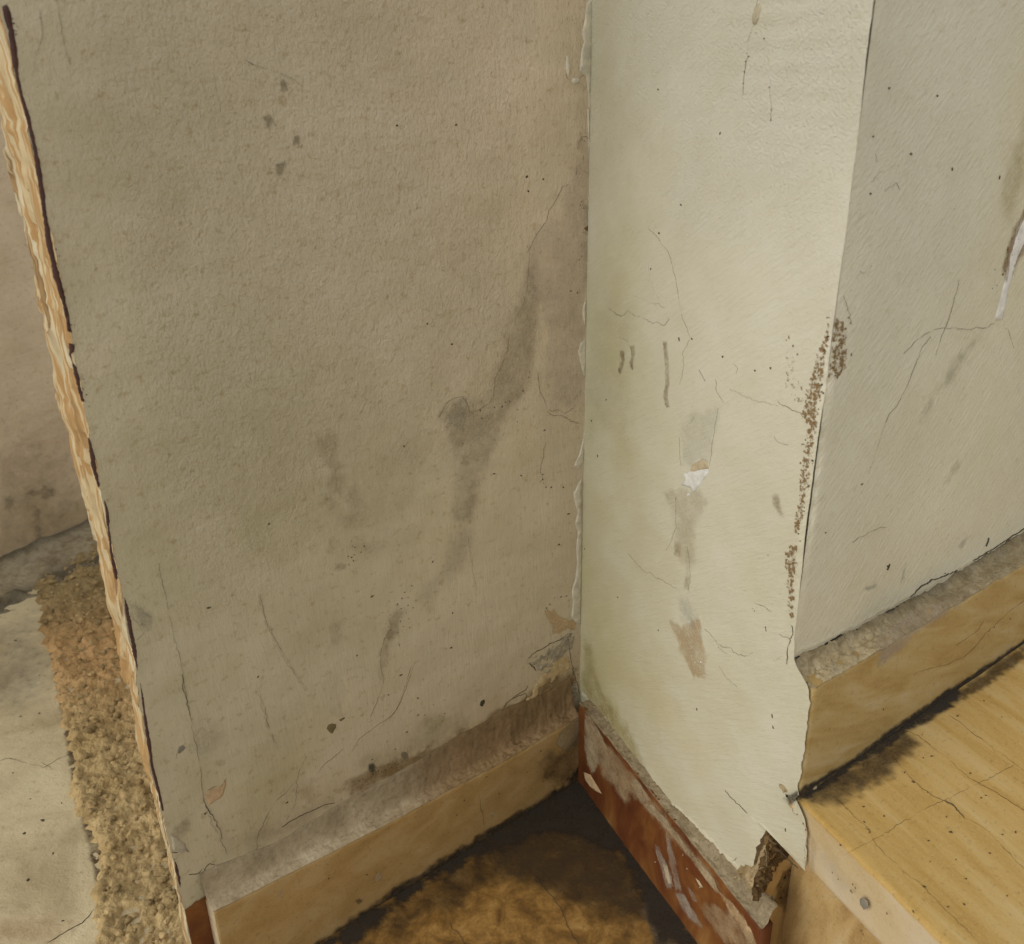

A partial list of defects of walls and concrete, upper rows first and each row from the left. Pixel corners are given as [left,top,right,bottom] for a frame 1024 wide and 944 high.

peeling [565,0,592,154]
crack [883,297,1011,429]
flaking render [682,459,709,497]
flaking render [503,435,585,708]
crack [258,773,334,835]
spalling [733,830,790,901]